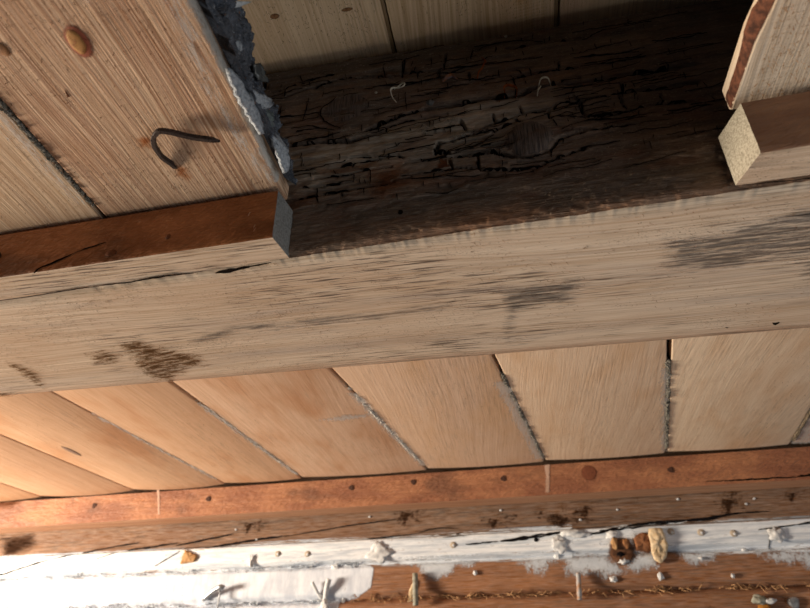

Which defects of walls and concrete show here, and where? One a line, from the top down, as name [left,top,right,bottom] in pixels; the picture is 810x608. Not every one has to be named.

crack [264,21,708,205]
crack [34,242,106,273]
crack [216,262,271,274]
crack [33,273,194,296]
crack [706,474,810,482]